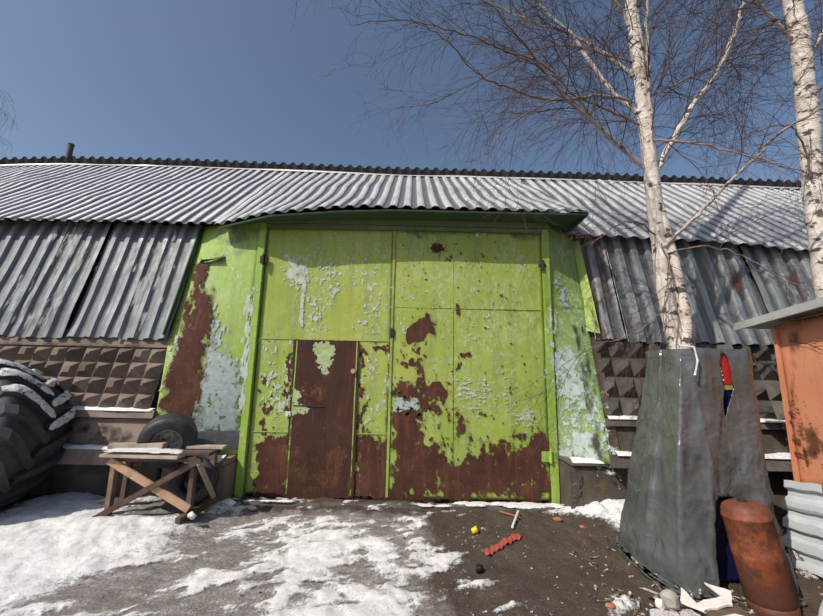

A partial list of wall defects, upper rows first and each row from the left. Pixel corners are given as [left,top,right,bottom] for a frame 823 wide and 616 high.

corrosion [158,258,223,421]
peeling [192,287,310,450]
peeling [275,250,456,375]
peeling [358,348,420,432]
corrosion [250,306,552,504]
corrosion [405,238,487,280]
peeling [448,305,544,434]
peeling [544,275,619,504]
corrosion [777,395,823,469]